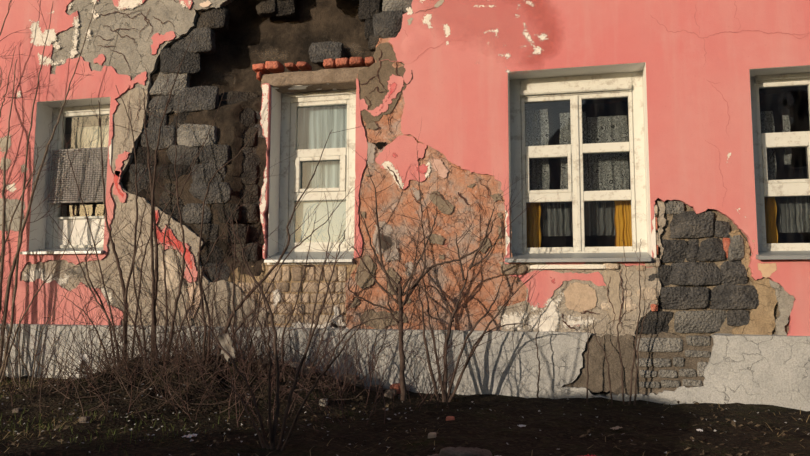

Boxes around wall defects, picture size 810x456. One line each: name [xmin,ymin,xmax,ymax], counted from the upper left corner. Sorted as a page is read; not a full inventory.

peeling [422,0,444,28]
peeling [515,1,547,55]
crack [651,0,809,206]
peeling [0,134,28,173]
spalling [21,0,413,329]
peeling [0,183,25,232]
spalling [357,38,795,396]